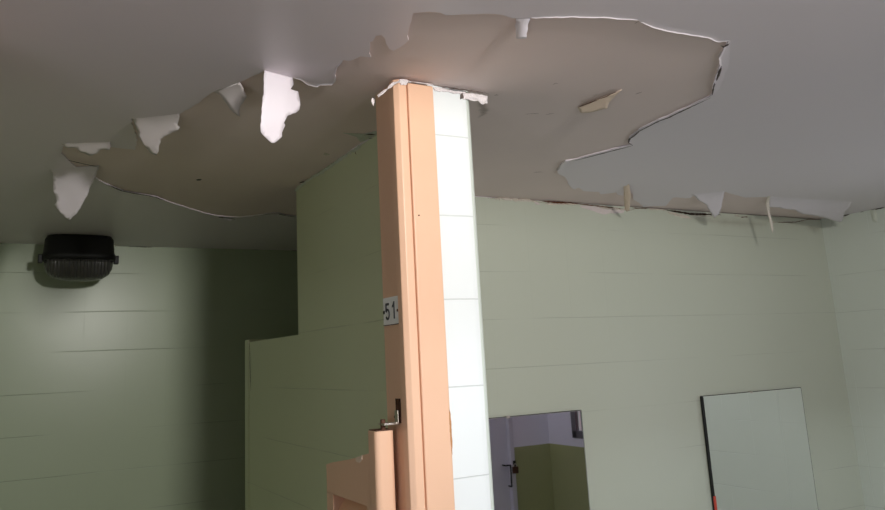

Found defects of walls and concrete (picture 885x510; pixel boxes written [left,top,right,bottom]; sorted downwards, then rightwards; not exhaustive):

peeling [51,12,851,233]